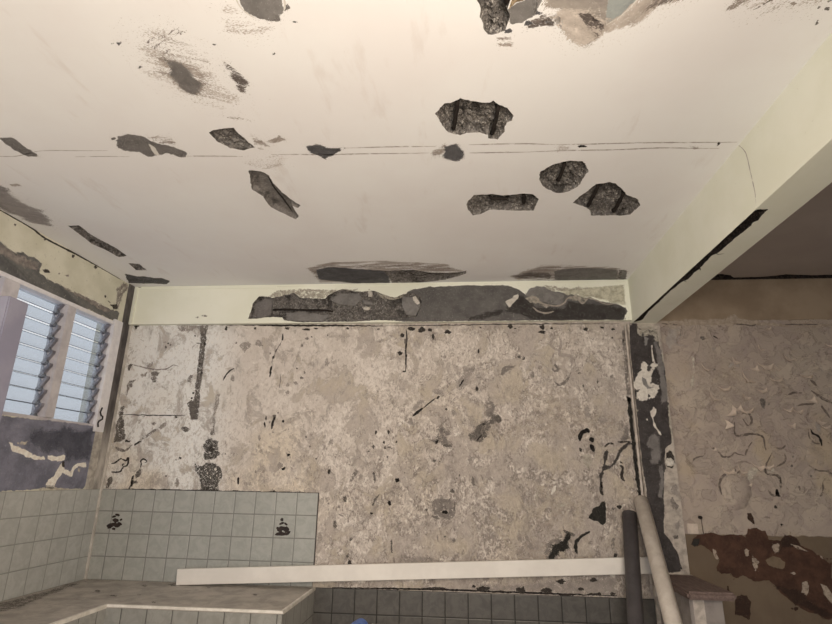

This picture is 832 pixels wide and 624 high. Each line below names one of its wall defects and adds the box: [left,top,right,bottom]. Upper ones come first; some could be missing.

spalling [477,0,643,35]
spalling [435,98,513,139]
peeling [111,134,190,158]
spalling [209,115,300,219]
spalling [466,194,539,215]
spalling [539,161,640,216]
spalling [69,225,146,270]
spalling [249,289,422,322]
peeling [629,209,832,575]
peeling [493,378,629,560]